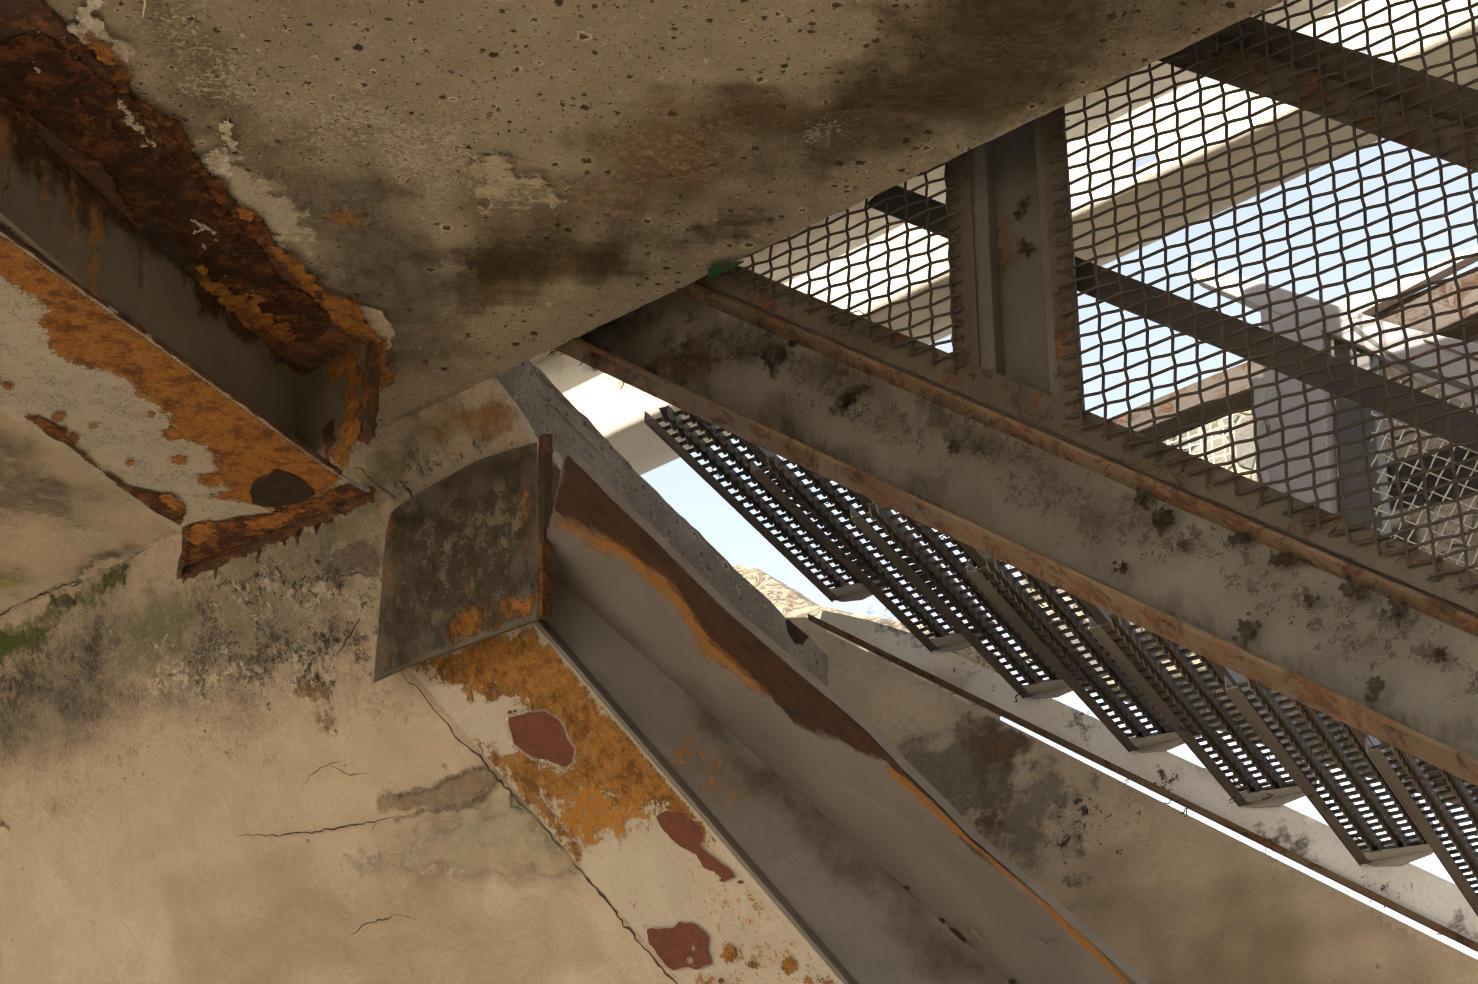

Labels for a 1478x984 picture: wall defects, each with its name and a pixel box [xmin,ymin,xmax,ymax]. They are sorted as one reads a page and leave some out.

leakage [585,0,1106,215]
corrosion [0,31,396,580]
mould [168,545,379,770]
crack [239,815,399,837]
crack [305,761,370,783]
crack [401,672,678,984]
peeling [507,710,574,767]
corrosion [410,587,839,984]
peeling [647,922,724,984]
peeling [656,811,744,884]
corrosion [553,455,1132,984]
leakage [900,721,1141,867]